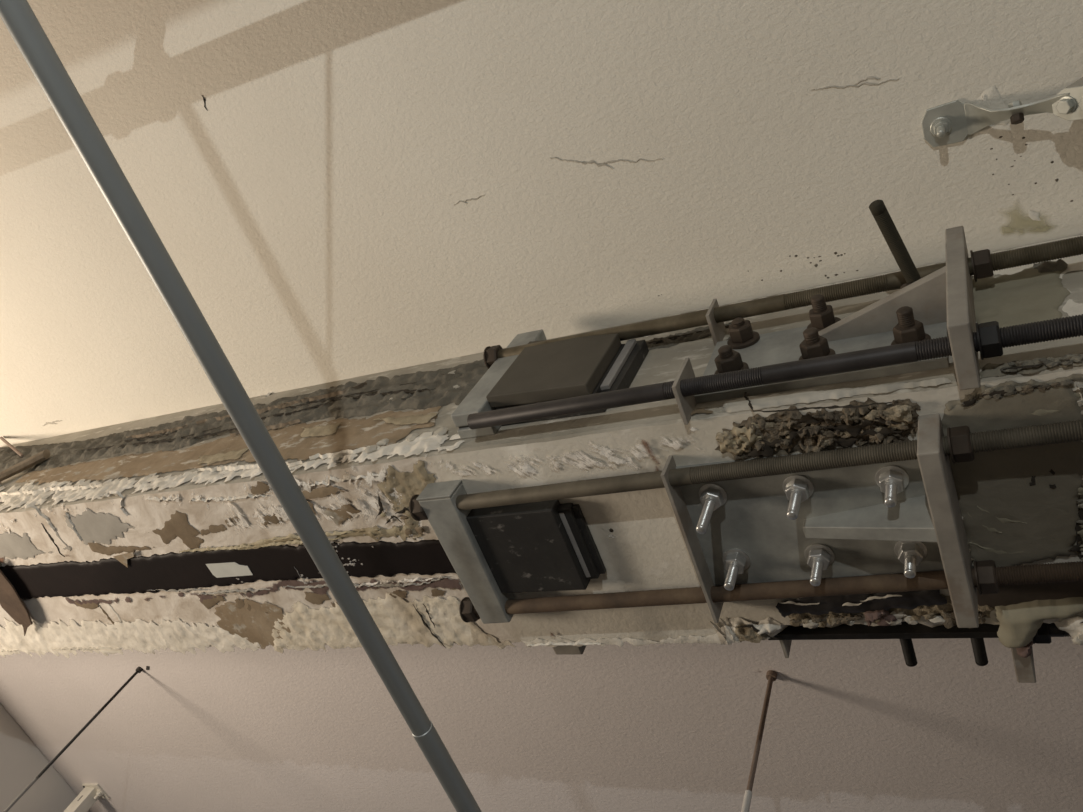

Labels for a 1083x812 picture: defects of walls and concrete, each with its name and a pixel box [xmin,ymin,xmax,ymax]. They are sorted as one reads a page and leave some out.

crack [812,76,898,90]
crack [554,157,663,168]
water stain [1002,210,1049,233]
spalling [0,410,255,485]
spalling [254,359,488,461]
spalling [715,398,921,460]
peeling [201,516,239,536]
peeling [368,460,436,542]
peeling [88,543,155,568]
peeling [272,601,362,653]
peeling [363,593,515,649]
spalling [731,590,957,643]